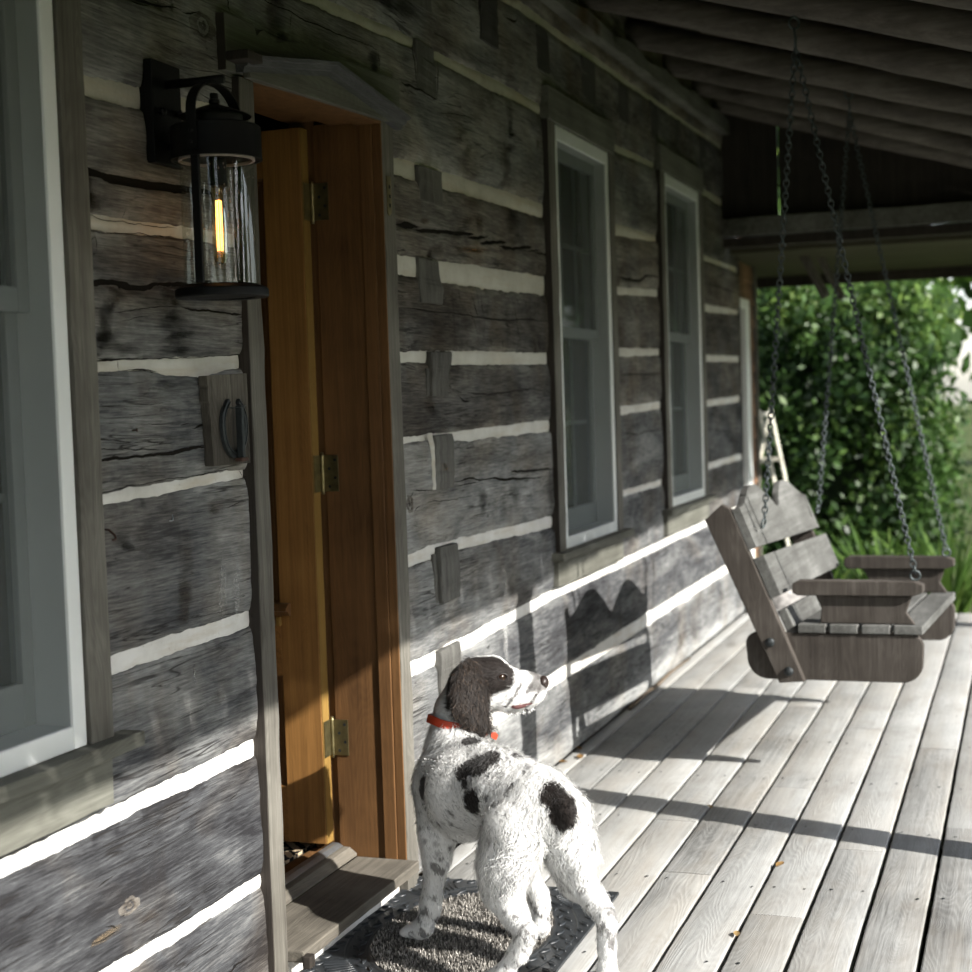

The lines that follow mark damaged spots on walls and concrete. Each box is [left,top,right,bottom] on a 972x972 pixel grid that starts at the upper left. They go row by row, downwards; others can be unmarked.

crack [129,0,196,15]
crack [88,167,214,195]
crack [90,214,174,255]
crack [396,221,546,255]
crack [93,279,241,321]
crack [101,403,246,493]